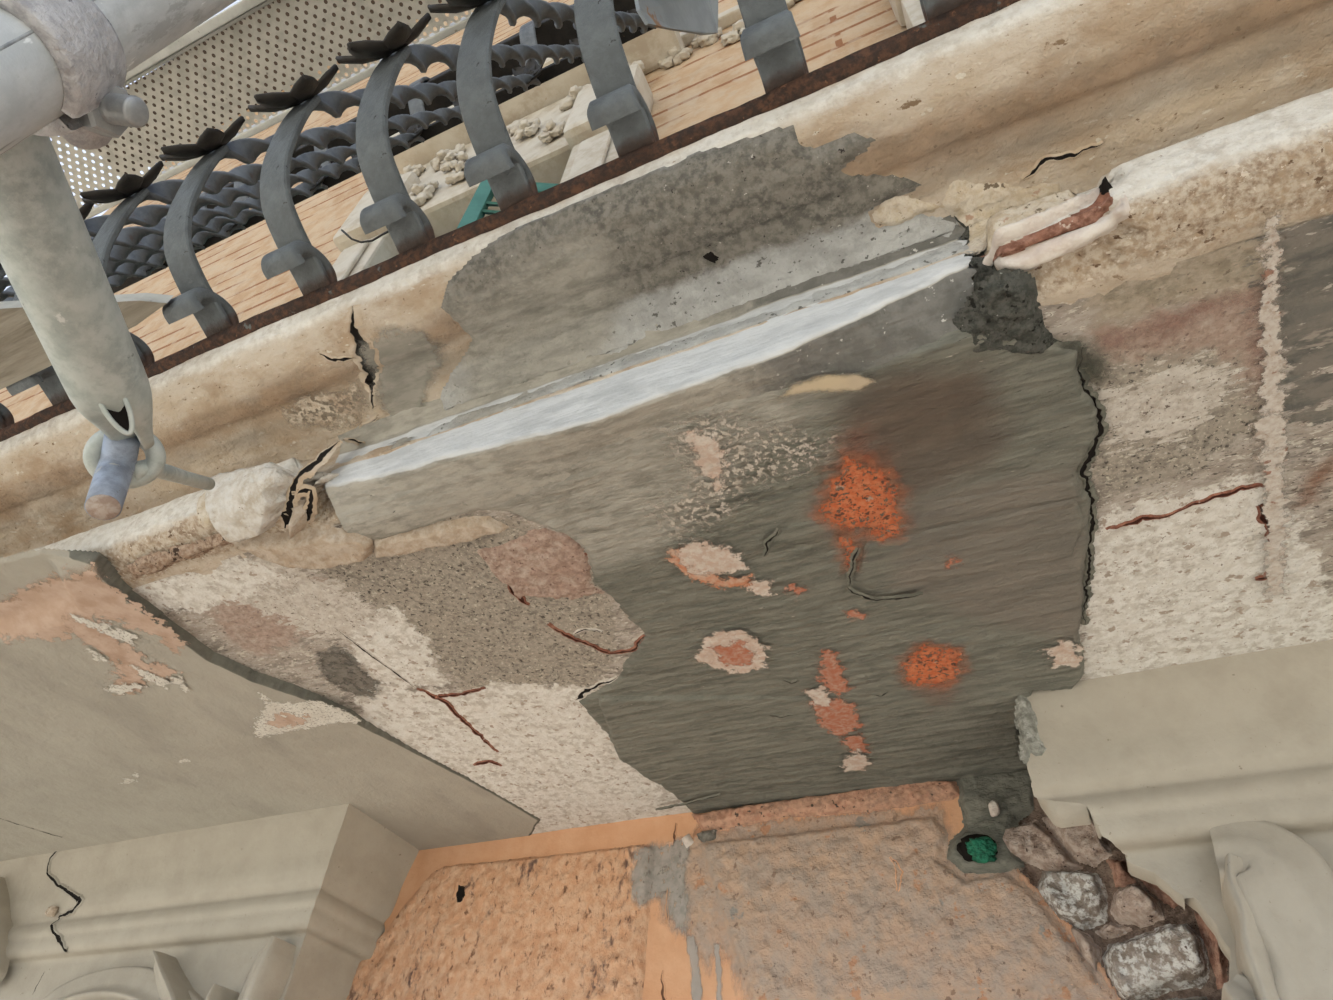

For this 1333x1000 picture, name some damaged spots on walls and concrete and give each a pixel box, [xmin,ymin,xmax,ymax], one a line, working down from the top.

spalling [872,177,1131,272]
crack [279,304,384,529]
spalling [126,462,604,606]
peeling [650,413,838,536]
crack [1077,346,1270,625]
peeling [0,562,191,696]
crack [333,627,502,766]
crack [547,622,645,701]
spalling [1038,640,1084,669]
crack [1,818,85,995]
leakage [632,808,1116,1000]
spalling [692,695,1229,1000]